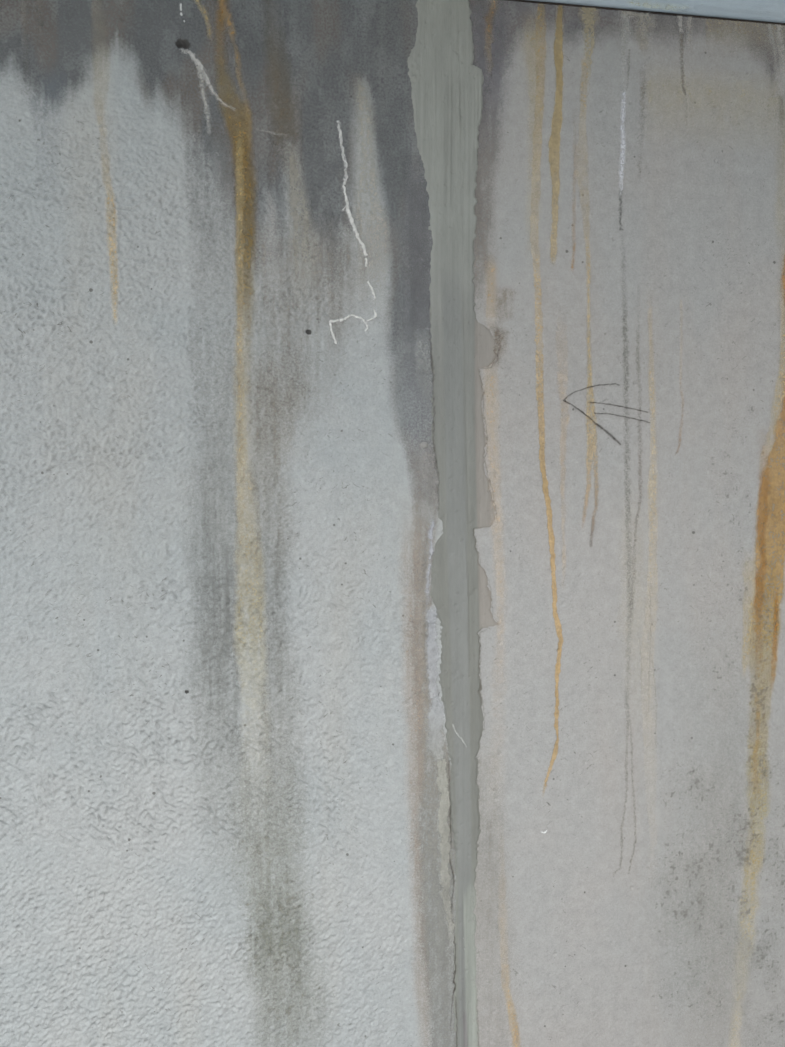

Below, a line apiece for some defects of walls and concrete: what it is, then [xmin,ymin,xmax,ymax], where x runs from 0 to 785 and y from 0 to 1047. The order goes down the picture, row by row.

rust [219,50,254,327]
crack [330,125,377,344]
rust [533,3,563,258]
water stain [0,0,456,1047]
rust [535,325,563,786]
rust [743,353,785,702]